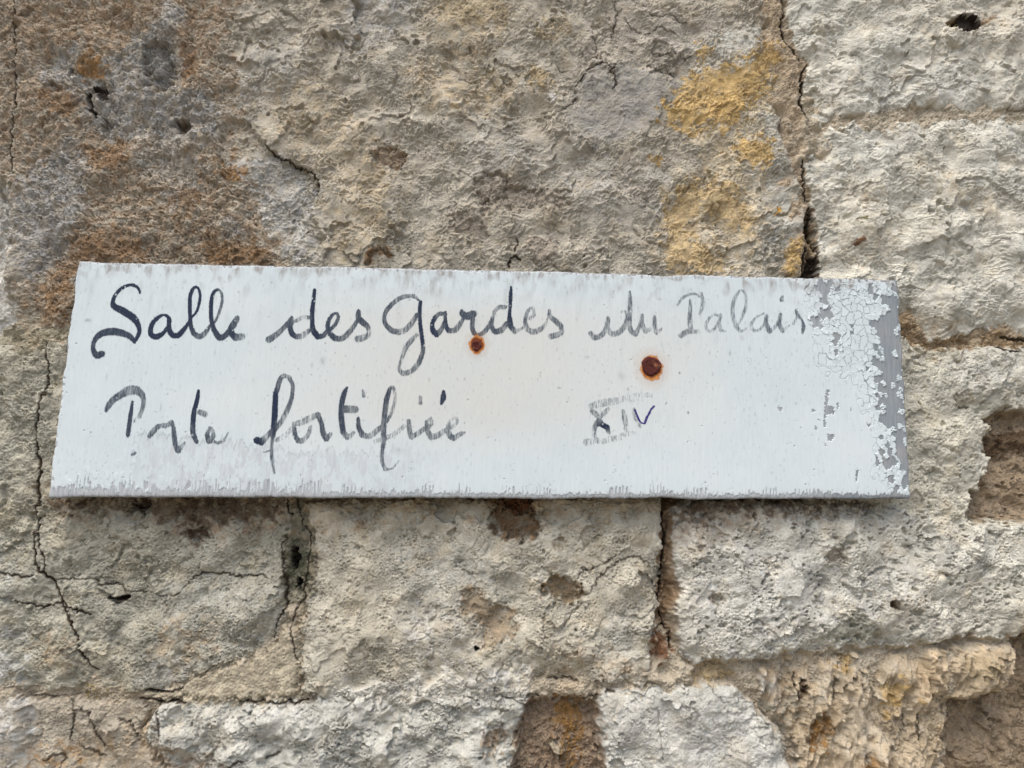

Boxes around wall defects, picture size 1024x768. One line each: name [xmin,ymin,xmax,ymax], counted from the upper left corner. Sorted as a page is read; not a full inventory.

crack [779,0,807,118]
crack [265,144,320,193]
crack [799,160,819,278]
crack [0,342,312,669]
spalling [965,408,1024,524]
crack [564,500,671,647]
crack [43,692,104,768]
crack [119,686,187,740]
crack [240,697,309,705]